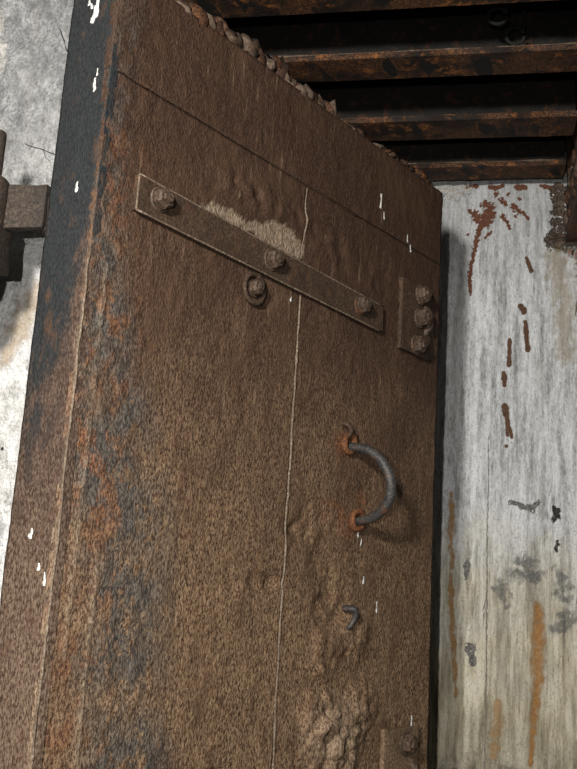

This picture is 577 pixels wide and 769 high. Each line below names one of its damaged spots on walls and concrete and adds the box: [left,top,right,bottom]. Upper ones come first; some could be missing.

rust [175,0,366,138]
rust [465,184,530,296]
rust [518,304,531,352]
rust [501,338,512,387]
rust [501,403,513,448]
rust [448,492,458,697]
leakage [506,558,540,583]
leakage [550,573,576,632]
rust [529,602,544,766]